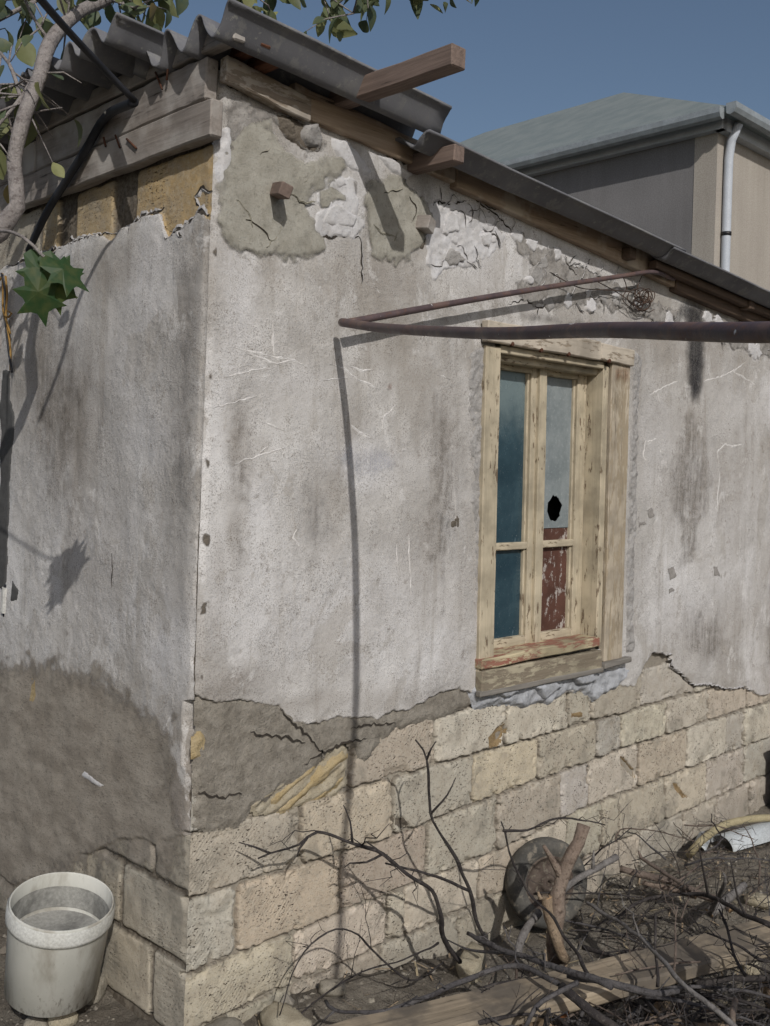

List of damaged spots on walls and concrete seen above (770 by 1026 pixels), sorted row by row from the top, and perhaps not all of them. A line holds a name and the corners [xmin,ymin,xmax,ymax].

peeling [211,95,371,240]
peeling [378,155,412,180]
crack [433,186,512,232]
peeling [420,194,678,322]
peeling [702,310,740,322]
peeling [722,343,770,361]
damp [0,370,19,601]
spalling [468,347,484,601]